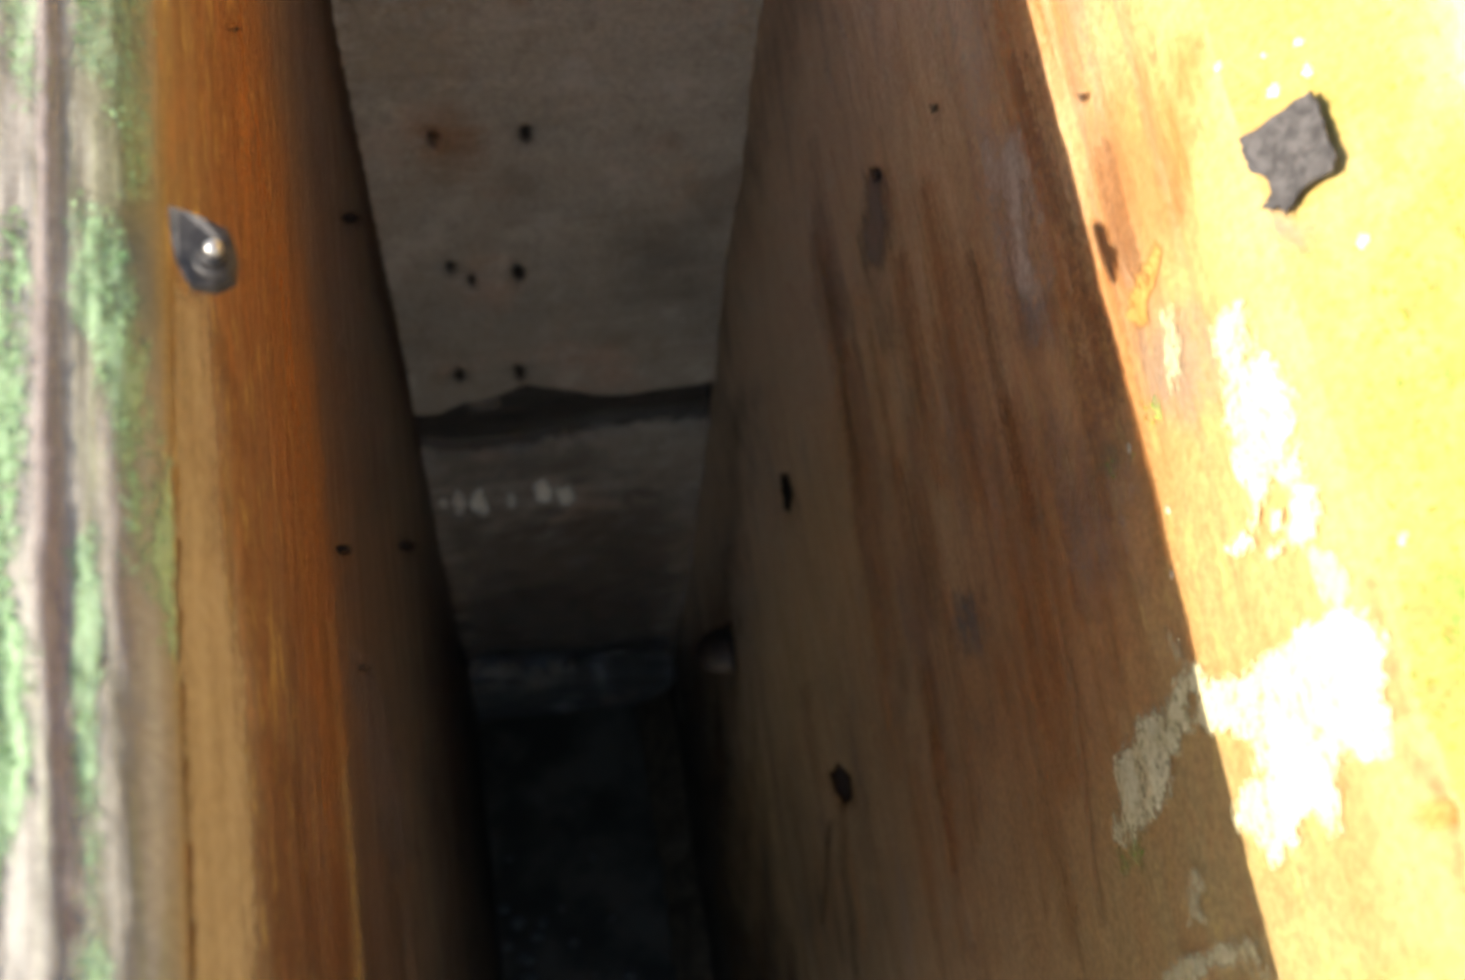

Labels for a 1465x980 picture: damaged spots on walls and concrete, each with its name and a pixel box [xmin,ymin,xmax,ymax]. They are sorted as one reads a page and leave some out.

flaking render [1112,299,1394,870]